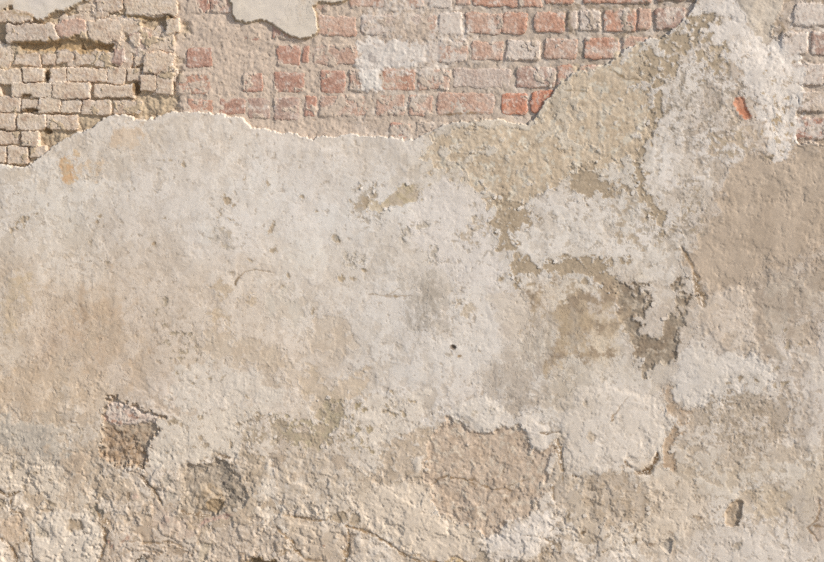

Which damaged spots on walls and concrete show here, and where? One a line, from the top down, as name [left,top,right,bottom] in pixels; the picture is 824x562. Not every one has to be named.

flaking render [0,0,93,24]
spalling [10,33,116,57]
spalling [119,11,174,24]
flaking render [227,0,351,42]
peeling [346,8,798,381]
spalling [329,233,369,284]
flaking render [97,392,185,471]
flaking render [145,269,559,562]
peeling [528,375,792,562]
crack [0,489,34,562]